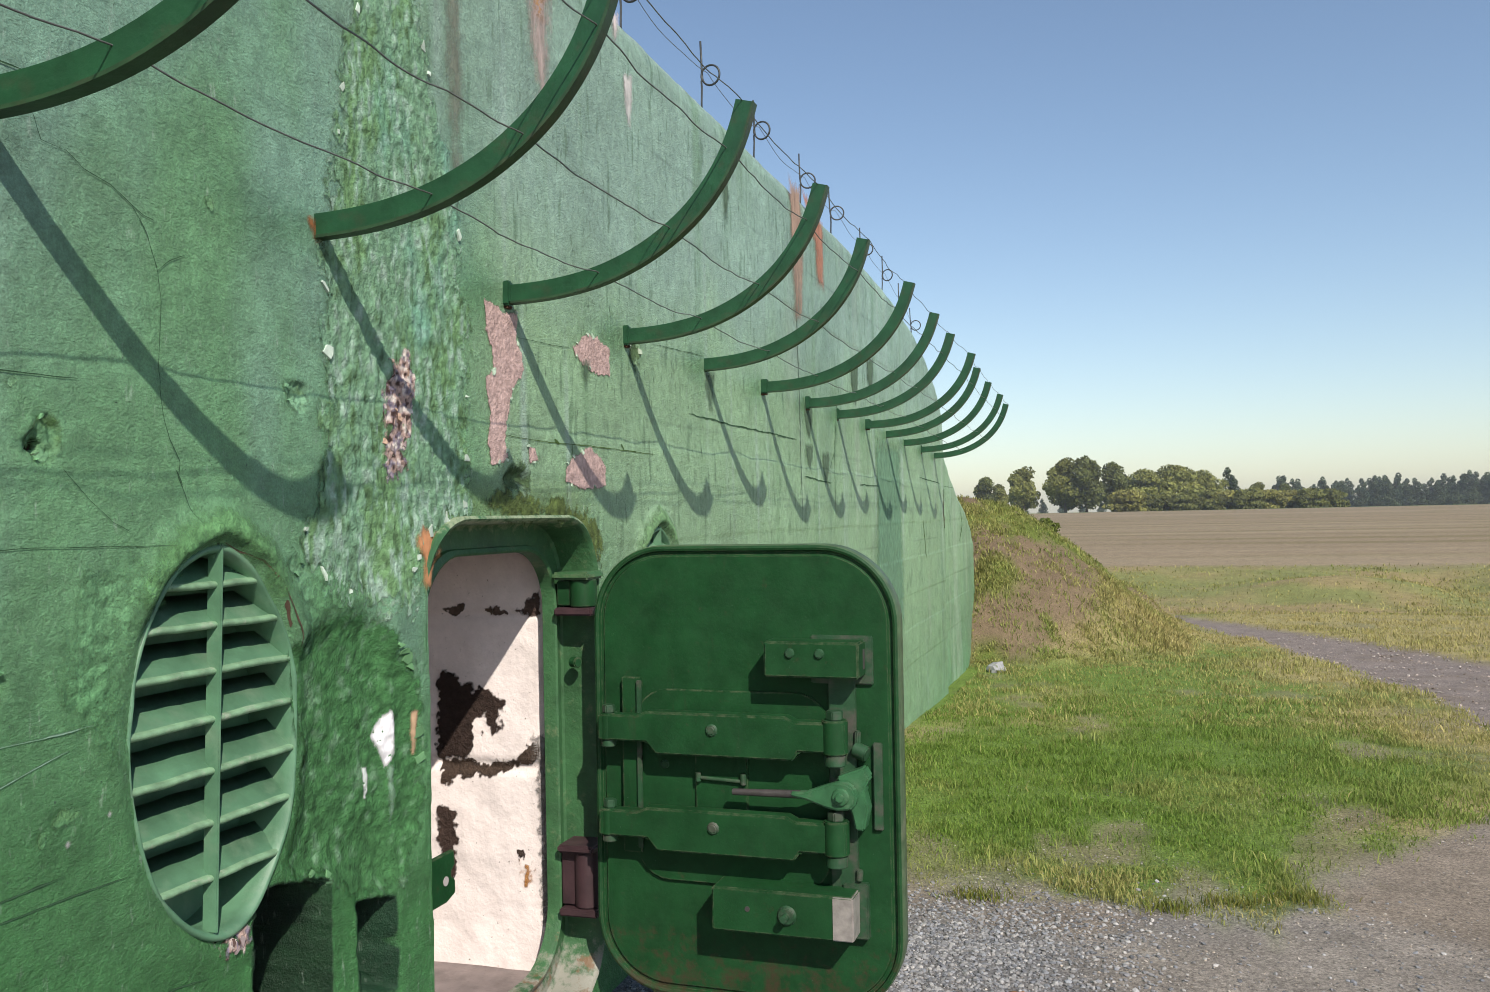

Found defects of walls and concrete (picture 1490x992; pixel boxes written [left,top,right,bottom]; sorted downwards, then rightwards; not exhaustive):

spalling [324,0,450,211]
corrosion [790,182,823,316]
crack [33,114,192,511]
peeling [573,333,610,376]
spalling [629,344,643,372]
crack [0,470,176,551]
crack [226,543,304,643]
spalling [284,202,538,900]
peeling [566,447,606,490]
crack [0,876,130,925]